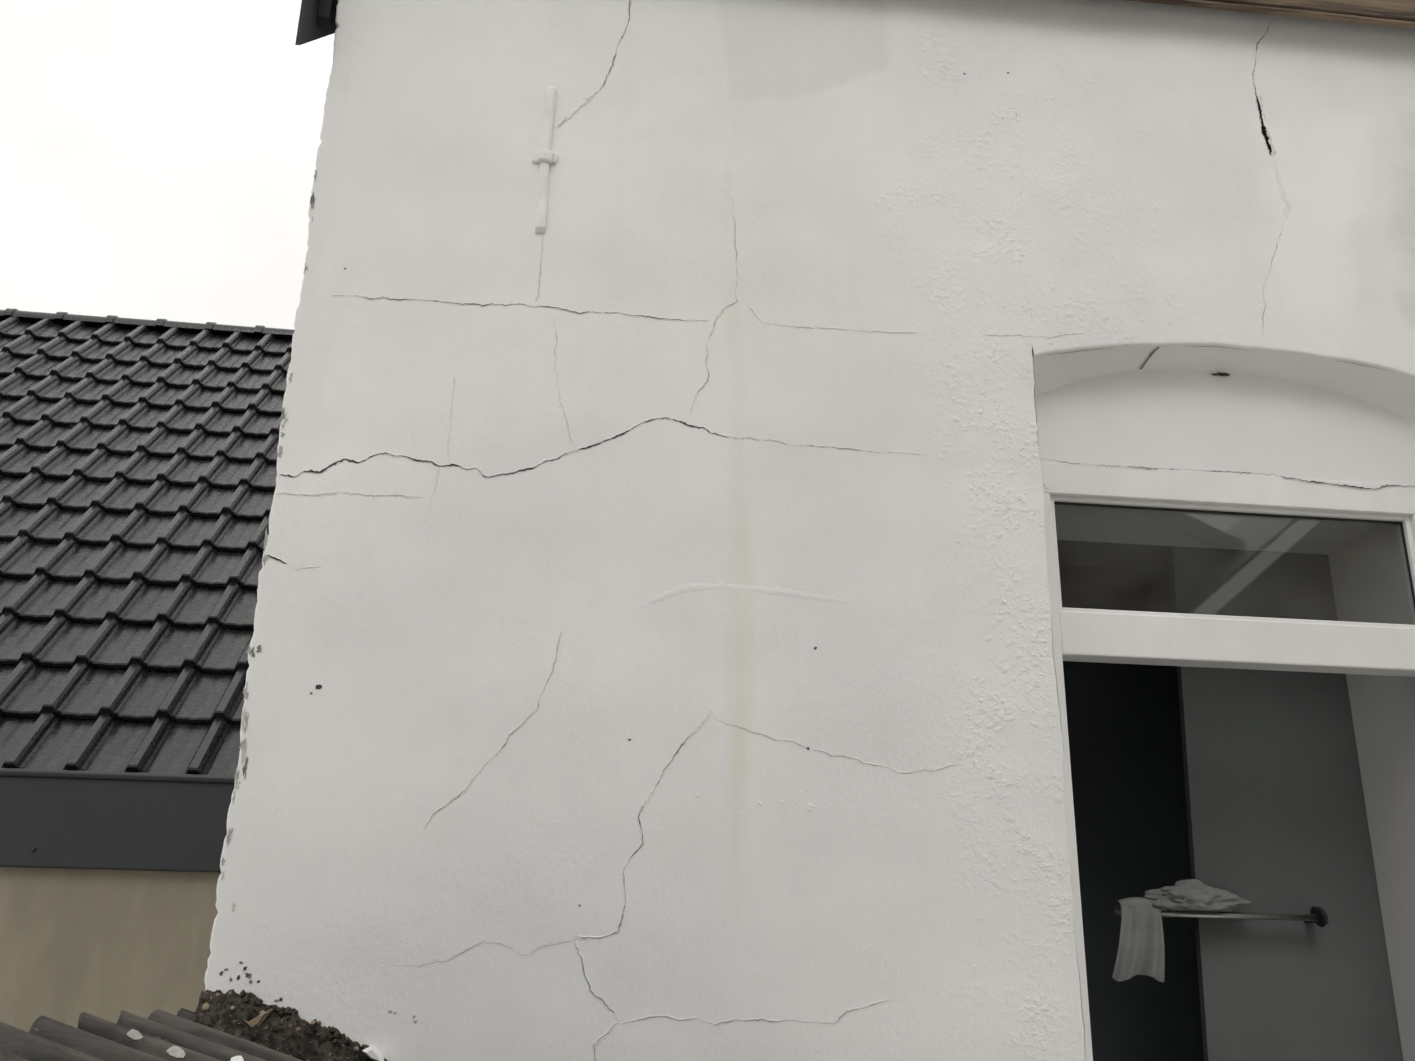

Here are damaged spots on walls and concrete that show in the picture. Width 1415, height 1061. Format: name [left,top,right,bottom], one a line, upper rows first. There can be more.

crack [557,0,632,128]
crack [1251,19,1276,156]
crack [276,195,922,527]
crack [985,331,1084,339]
crack [1262,207,1286,336]
crack [1054,460,1411,490]
crack [423,631,563,829]
crack [389,711,960,1061]
spalling [193,961,387,1061]